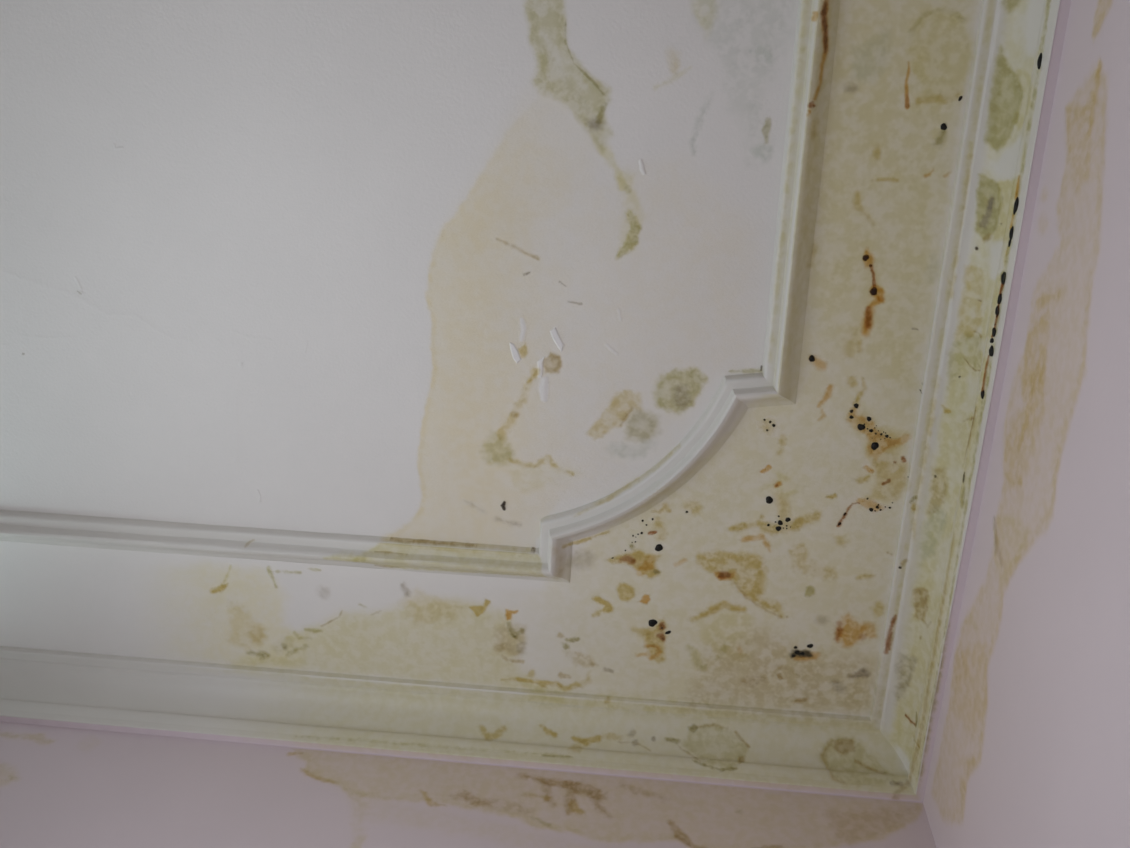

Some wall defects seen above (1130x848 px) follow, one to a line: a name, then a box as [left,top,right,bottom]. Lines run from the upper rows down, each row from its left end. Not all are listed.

water stain [849,403,891,450]
water stain [766,496,791,531]